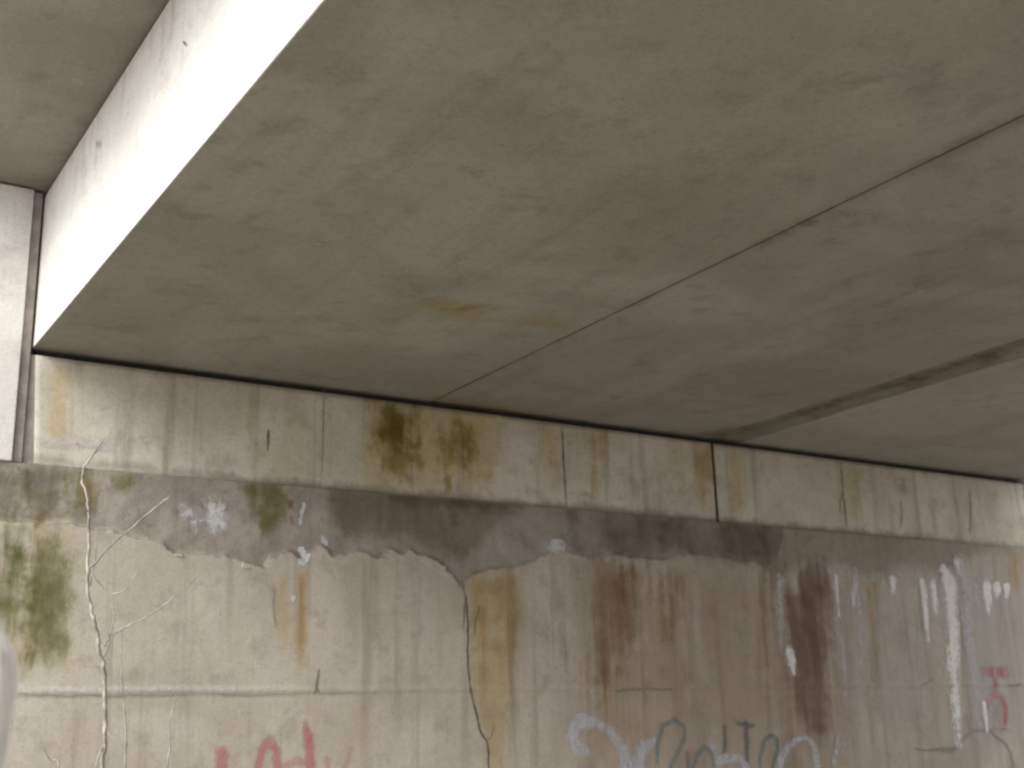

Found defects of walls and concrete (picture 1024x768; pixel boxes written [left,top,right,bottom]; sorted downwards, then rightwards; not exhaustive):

leakage [183,501,227,534]
leakage [297,547,311,566]
leakage [834,574,858,617]
leakage [983,580,1010,615]
crack [461,578,495,768]
leakage [786,646,796,676]
leakage [919,557,963,748]